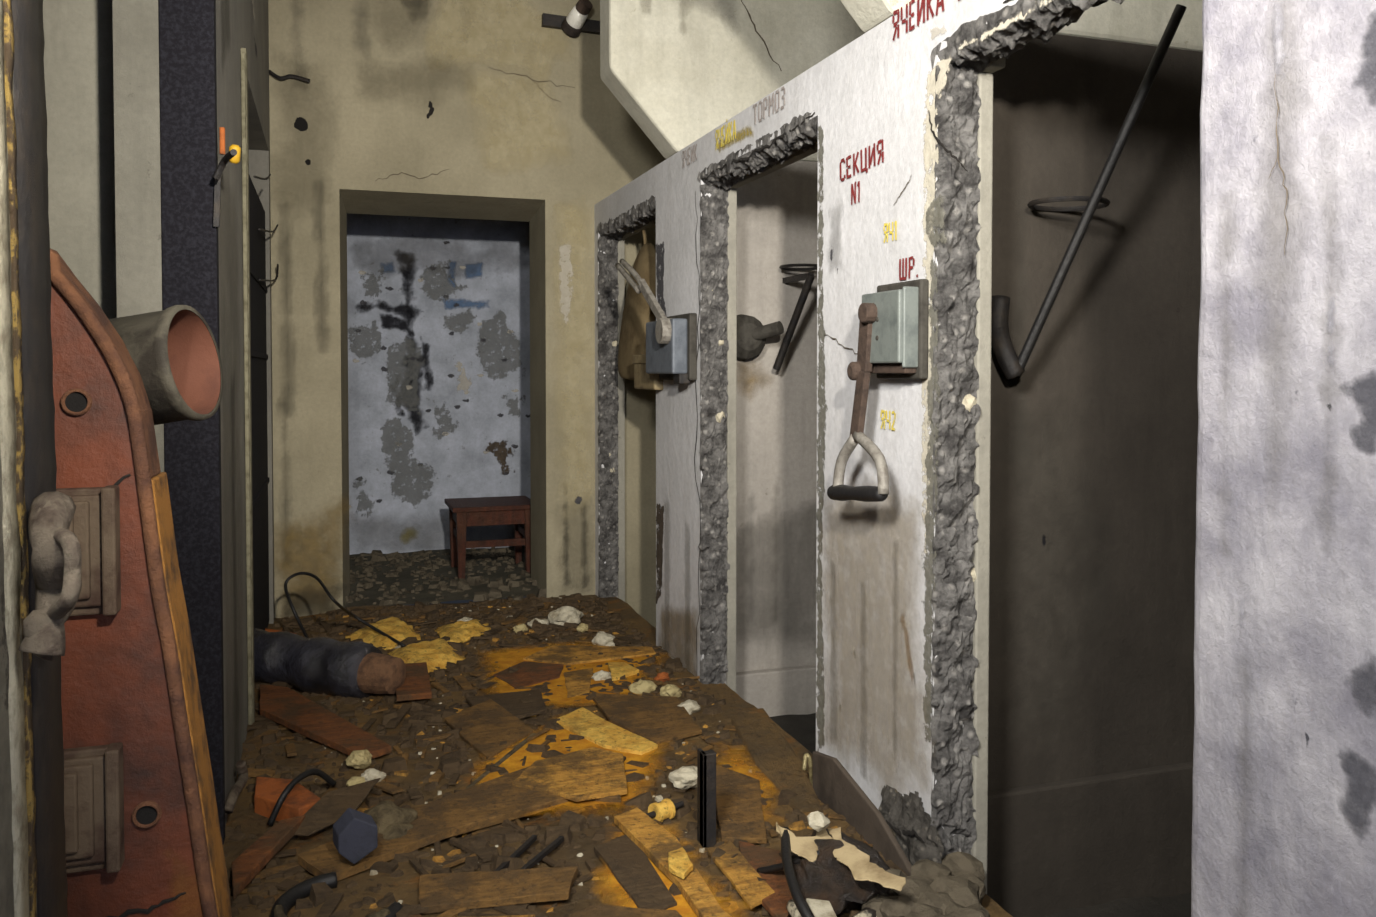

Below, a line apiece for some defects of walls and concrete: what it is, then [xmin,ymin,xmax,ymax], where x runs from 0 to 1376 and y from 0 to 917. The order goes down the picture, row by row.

peeling [348,241,530,517]
spalling [575,195,656,602]
spalling [656,241,667,317]
spalling [697,112,828,752]
spalling [878,0,1125,894]